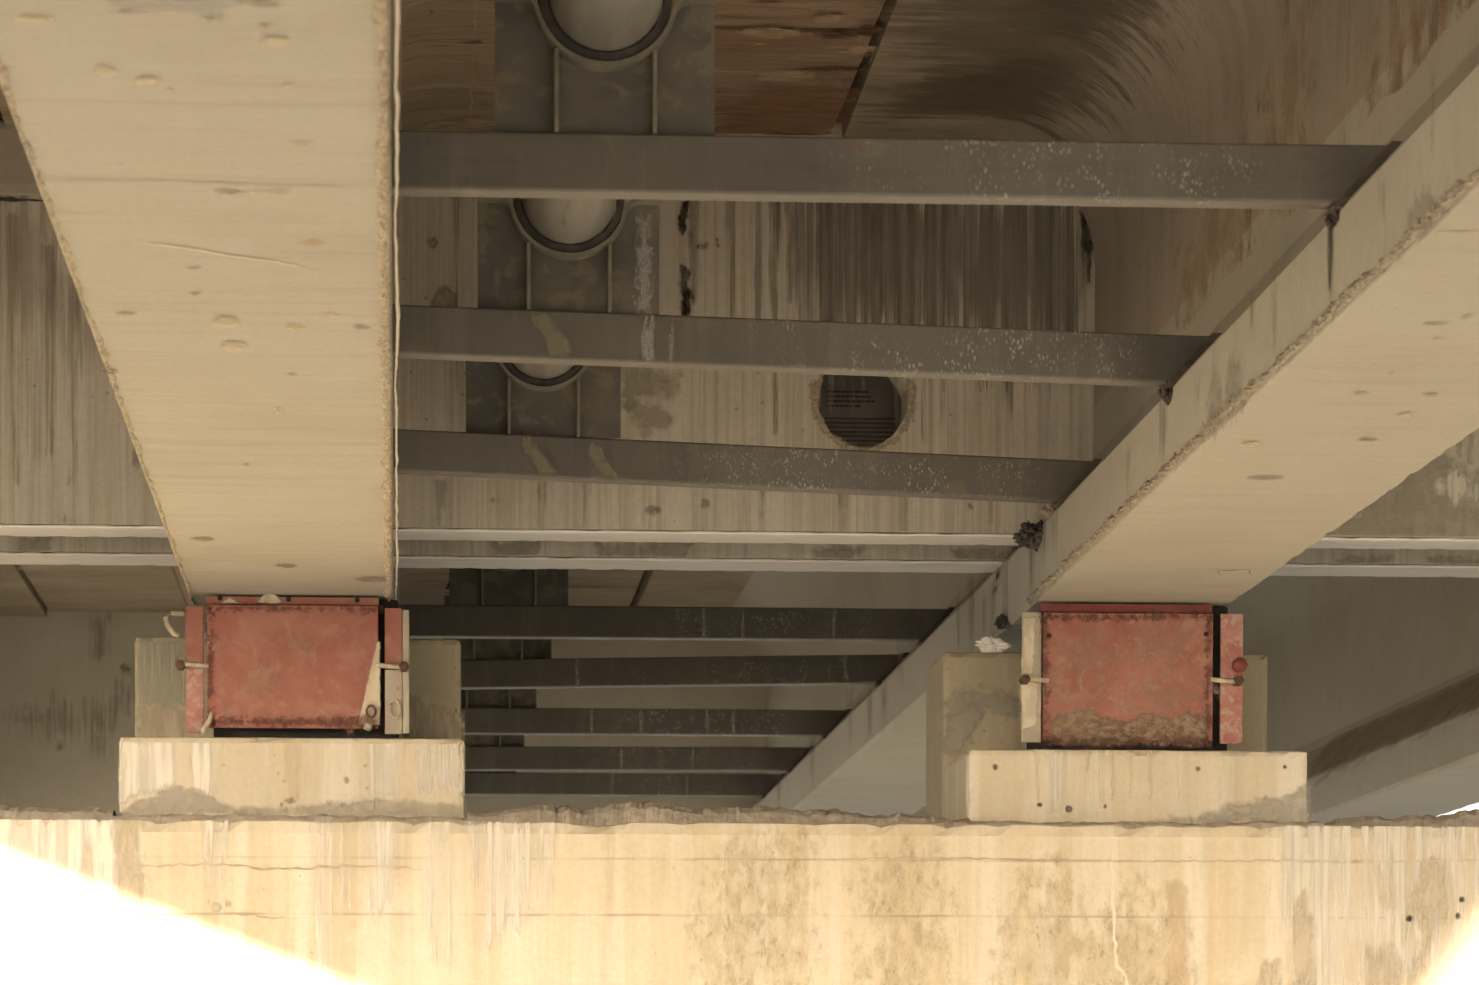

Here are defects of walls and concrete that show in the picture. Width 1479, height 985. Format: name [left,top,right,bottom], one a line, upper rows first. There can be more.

crack [0,195,43,203]
spalling [0,55,198,607]
water stain [1331,456,1479,537]
rust [1040,611,1212,748]
crack [829,850,1479,985]